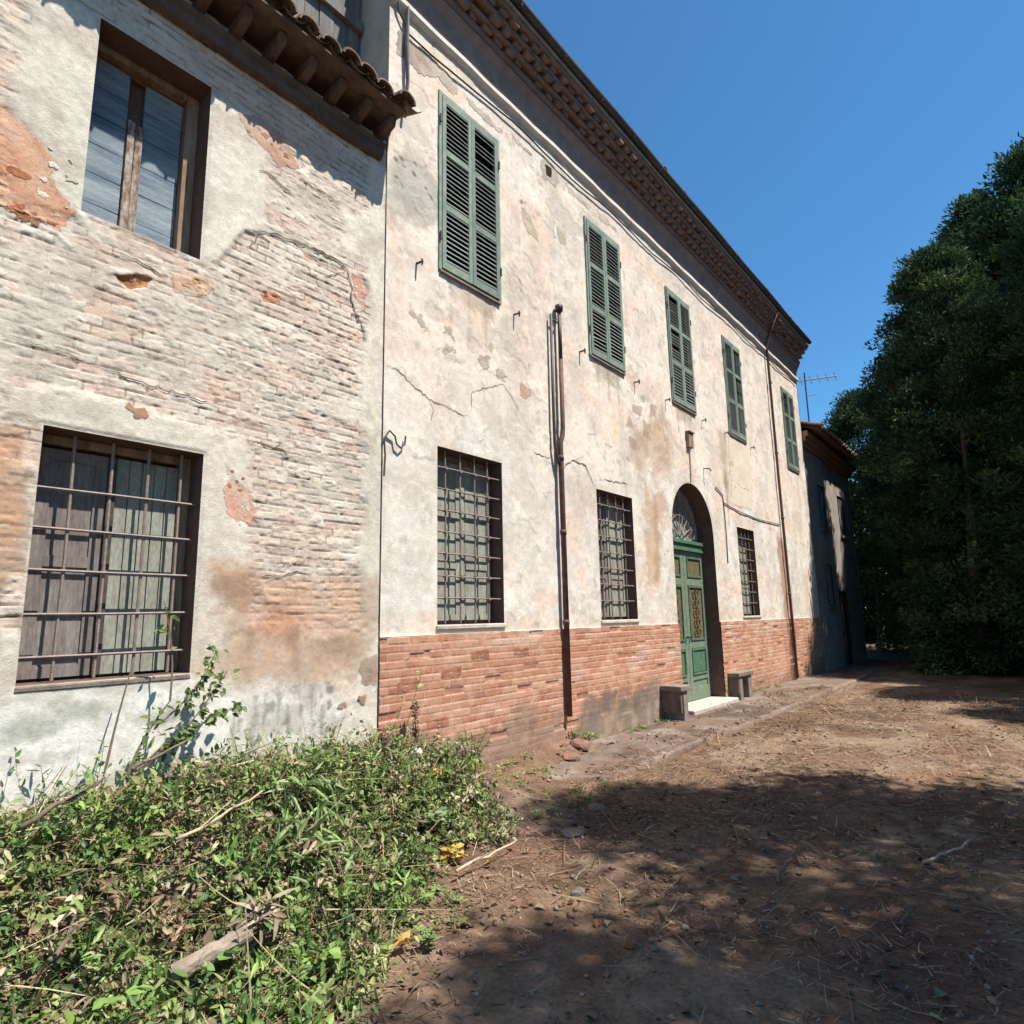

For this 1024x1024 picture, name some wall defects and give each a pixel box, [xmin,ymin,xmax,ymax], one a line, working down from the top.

flaking render [0,102,79,231]
spalling [239,112,300,169]
spalling [117,274,151,289]
flaking render [169,271,219,297]
spalling [261,290,281,303]
crack [251,231,371,342]
spalling [351,274,369,308]
crack [2,334,228,412]
peeling [125,401,149,418]
crack [391,367,519,418]
flaking render [223,470,257,526]
water stain [0,563,377,815]